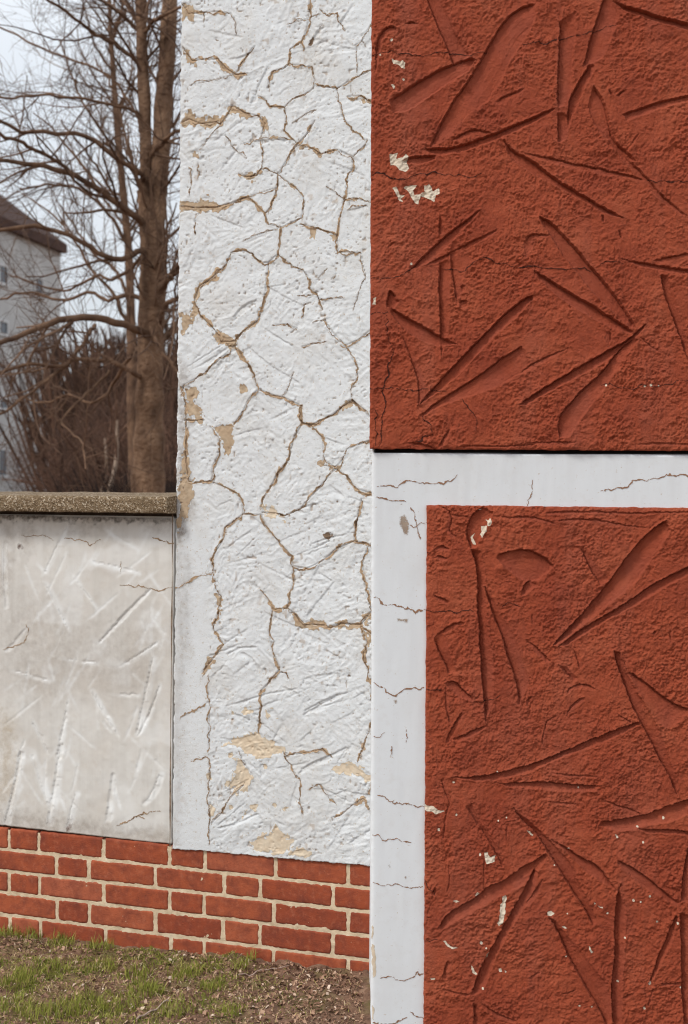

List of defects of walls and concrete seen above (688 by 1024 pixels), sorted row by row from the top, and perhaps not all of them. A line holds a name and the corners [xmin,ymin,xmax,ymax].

crack [523,25,616,45]
spalling [390,153,409,172]
spalling [393,185,440,204]
peeling [184,387,234,455]
crack [116,0,485,844]
peeling [176,452,195,533]
crack [601,473,688,491]
spalling [471,519,492,545]
peeling [221,732,286,819]
peeling [249,824,312,858]